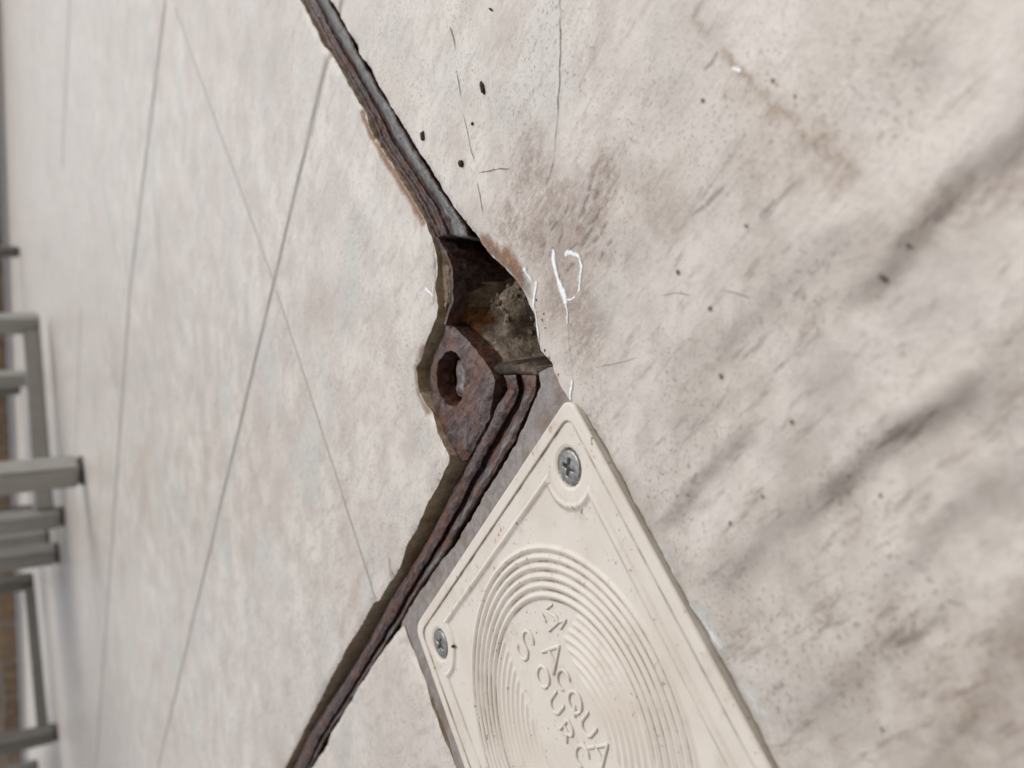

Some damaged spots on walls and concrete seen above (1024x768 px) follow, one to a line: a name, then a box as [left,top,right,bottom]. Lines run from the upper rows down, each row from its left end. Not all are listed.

crack [545,4,561,185]
corrosion [360,110,425,224]
spalling [425,241,451,309]
corrosion [481,236,524,287]
spalling [464,221,553,375]